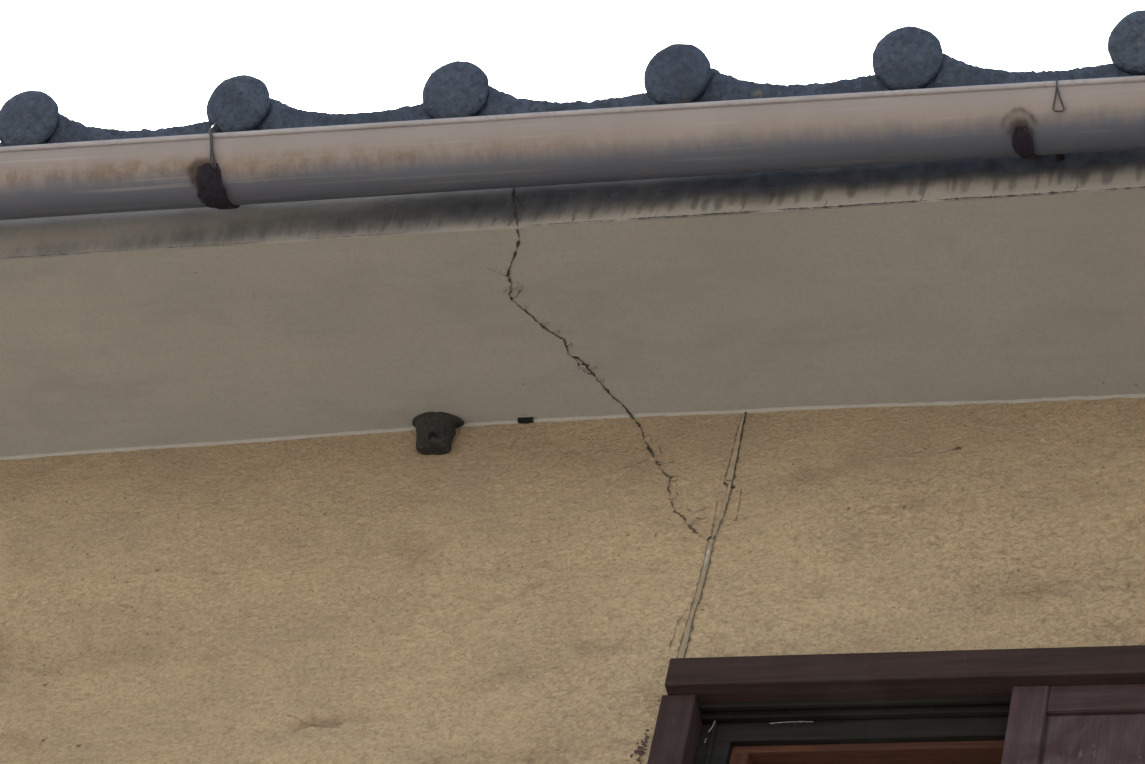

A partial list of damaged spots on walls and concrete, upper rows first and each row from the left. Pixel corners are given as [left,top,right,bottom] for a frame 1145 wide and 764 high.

water stain [327,149,1145,228]
crack [488,184,1145,658]